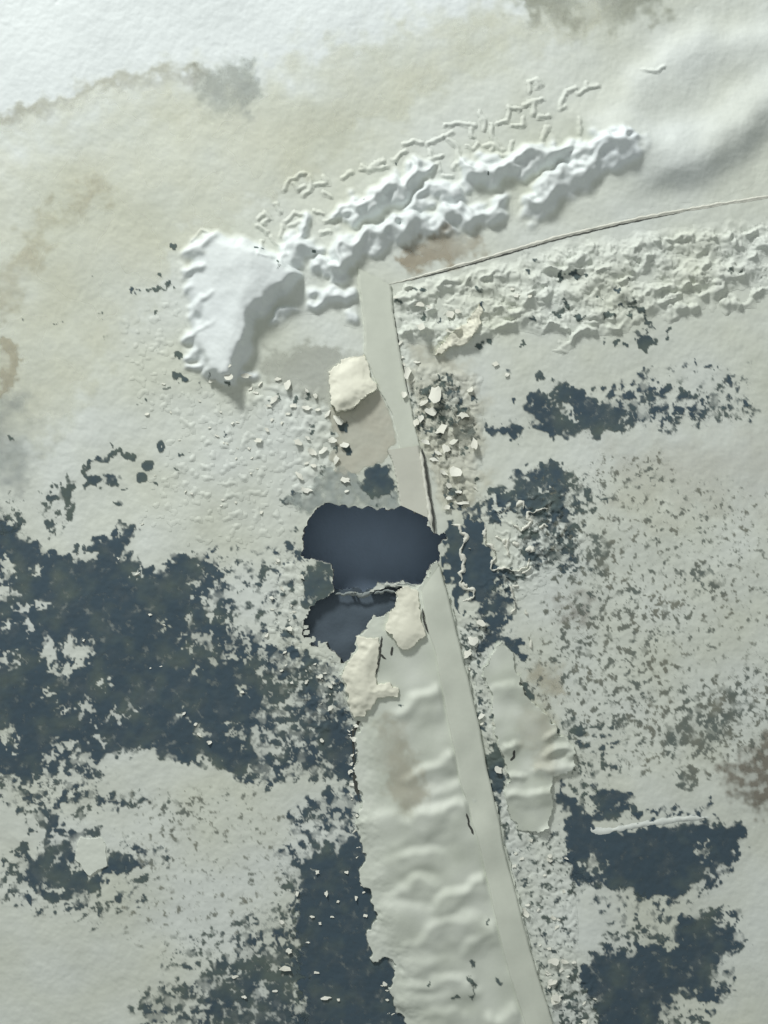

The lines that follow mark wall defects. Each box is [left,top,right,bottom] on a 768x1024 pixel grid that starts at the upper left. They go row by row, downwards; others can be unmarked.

crack [389,196,768,285]
leakage [331,422,352,455]
spalling [398,303,486,514]
leakage [410,358,760,463]
leakage [0,440,406,1024]
peeling [208,354,600,1024]
leakage [441,452,768,1024]